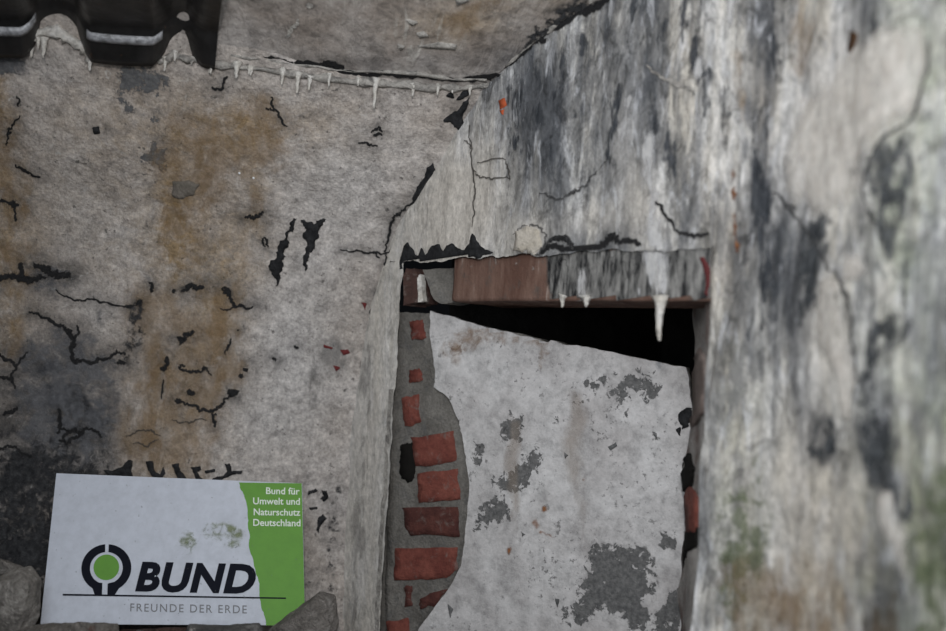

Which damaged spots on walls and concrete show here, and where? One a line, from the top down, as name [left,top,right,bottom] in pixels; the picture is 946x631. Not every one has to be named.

crack [264,0,609,84]
crack [340,177,428,266]
crack [514,224,641,256]
leakage [549,106,678,295]
leakage [749,128,770,301]
leakage [866,135,915,259]
leakage [0,303,143,588]
crack [0,262,253,447]
peeling [584,366,663,418]
spalling [375,389,543,631]
peeling [555,543,681,631]
peeling [654,531,677,550]